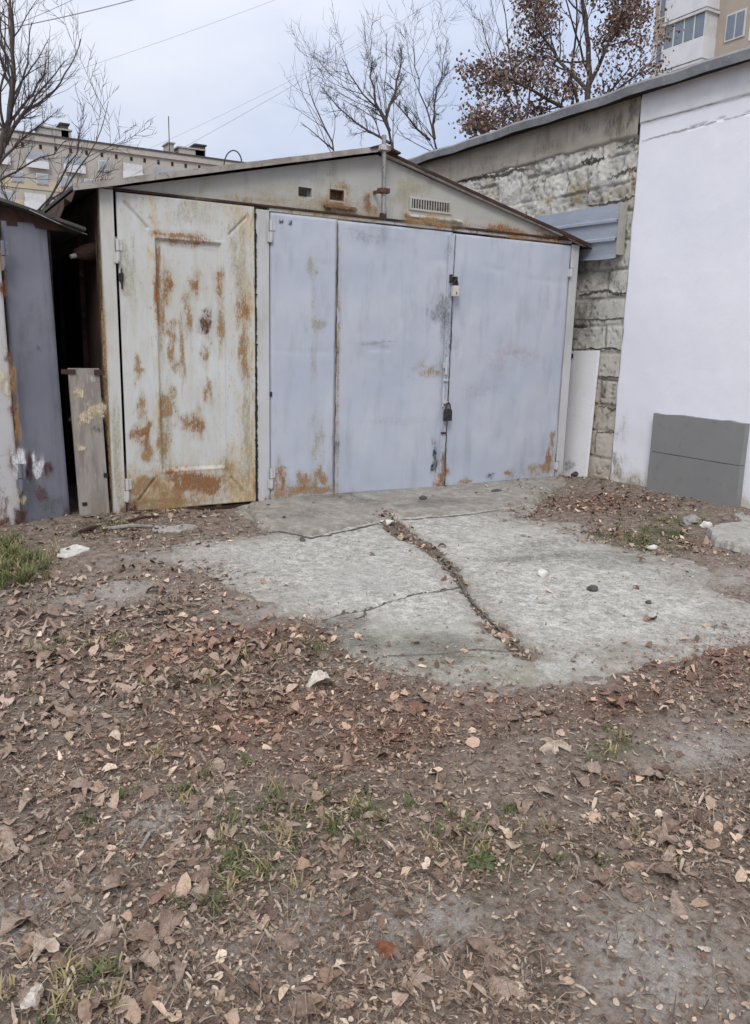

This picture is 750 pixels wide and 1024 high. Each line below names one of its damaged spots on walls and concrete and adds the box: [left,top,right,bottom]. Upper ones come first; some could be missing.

rust [154,195,284,502]
peeling [73,377,106,425]
peeling [11,448,53,509]
rust [125,355,240,511]
rust [271,465,338,499]
rust [529,432,555,476]
crack [273,509,537,662]